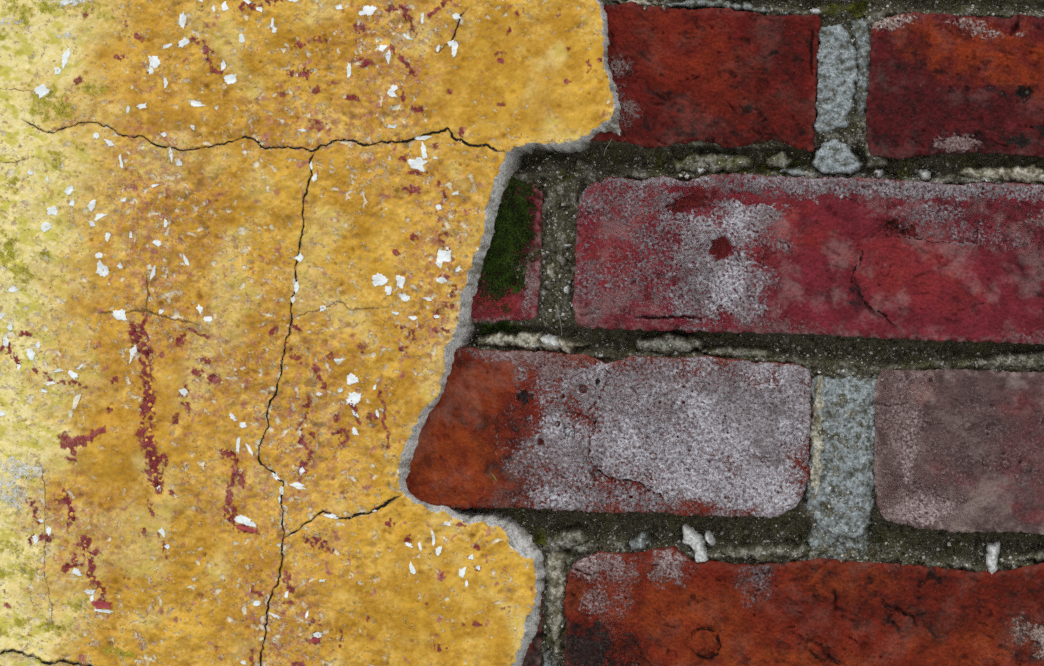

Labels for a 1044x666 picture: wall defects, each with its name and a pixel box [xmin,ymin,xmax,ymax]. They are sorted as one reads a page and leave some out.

spalling [1014,85,1034,103]
spalling [663,184,716,214]
spalling [709,236,734,262]
peeling [372,273,417,320]
leakage [516,252,539,319]
spalling [398,0,621,666]
crack [25,121,500,666]
peeling [682,524,716,563]
crack [0,649,91,666]